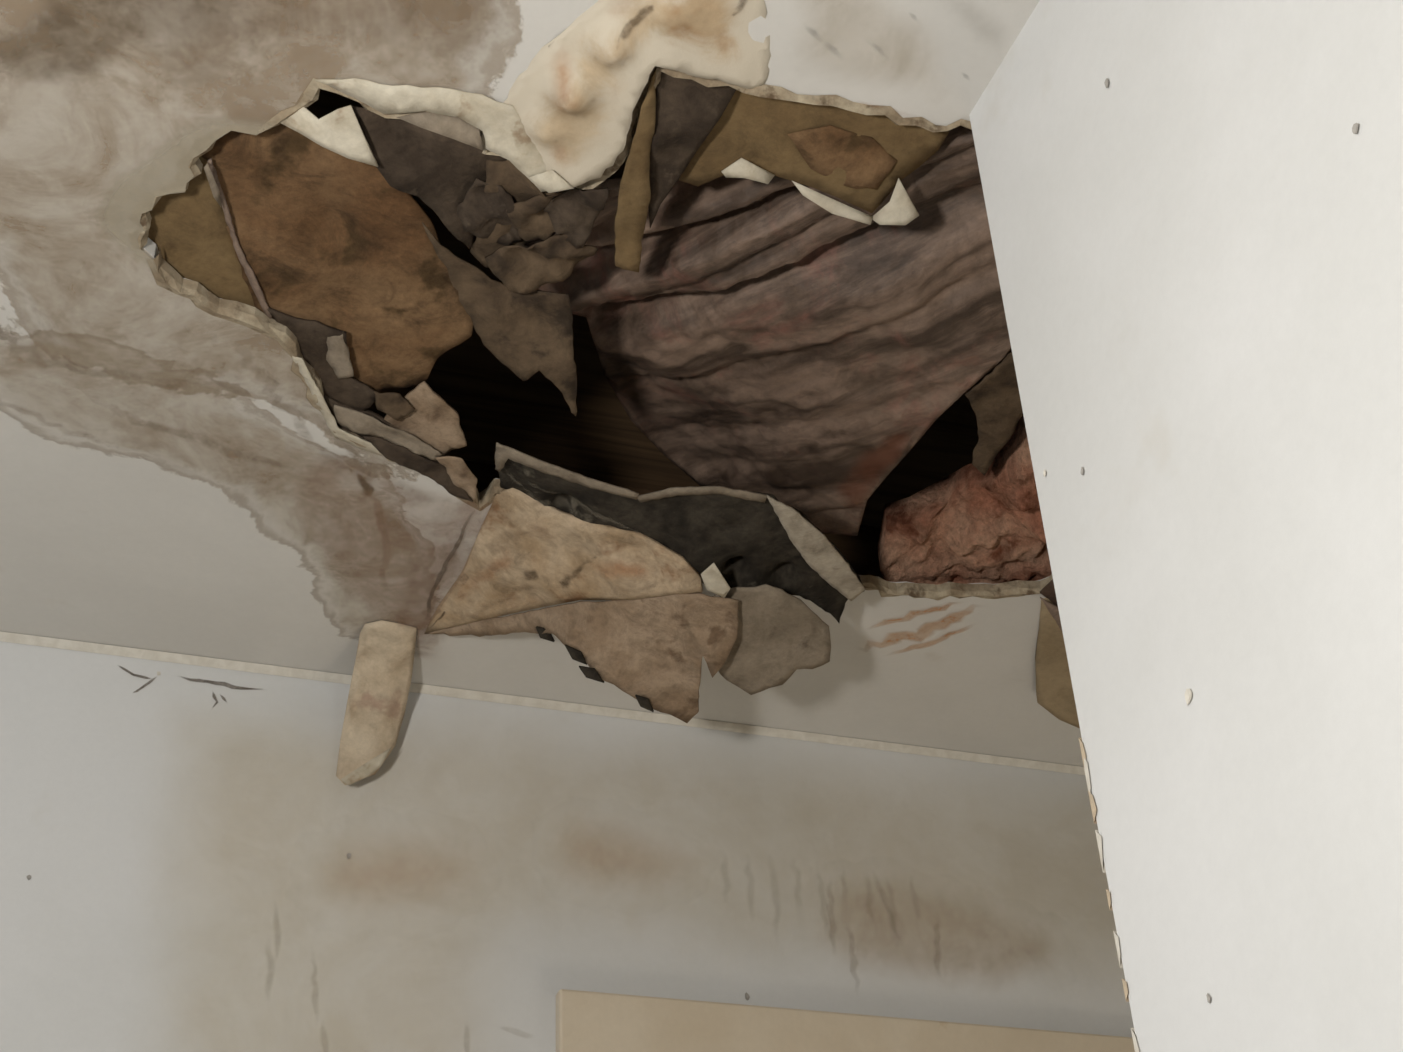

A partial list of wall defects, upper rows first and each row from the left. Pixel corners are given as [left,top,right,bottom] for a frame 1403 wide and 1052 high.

flaking render [105,125,258,259]
water stain [0,0,494,342]
peeling [316,78,574,193]
water stain [206,421,415,578]
peeling [701,563,730,598]
peeling [336,620,416,785]
peeling [536,626,604,683]
peeling [635,695,654,712]